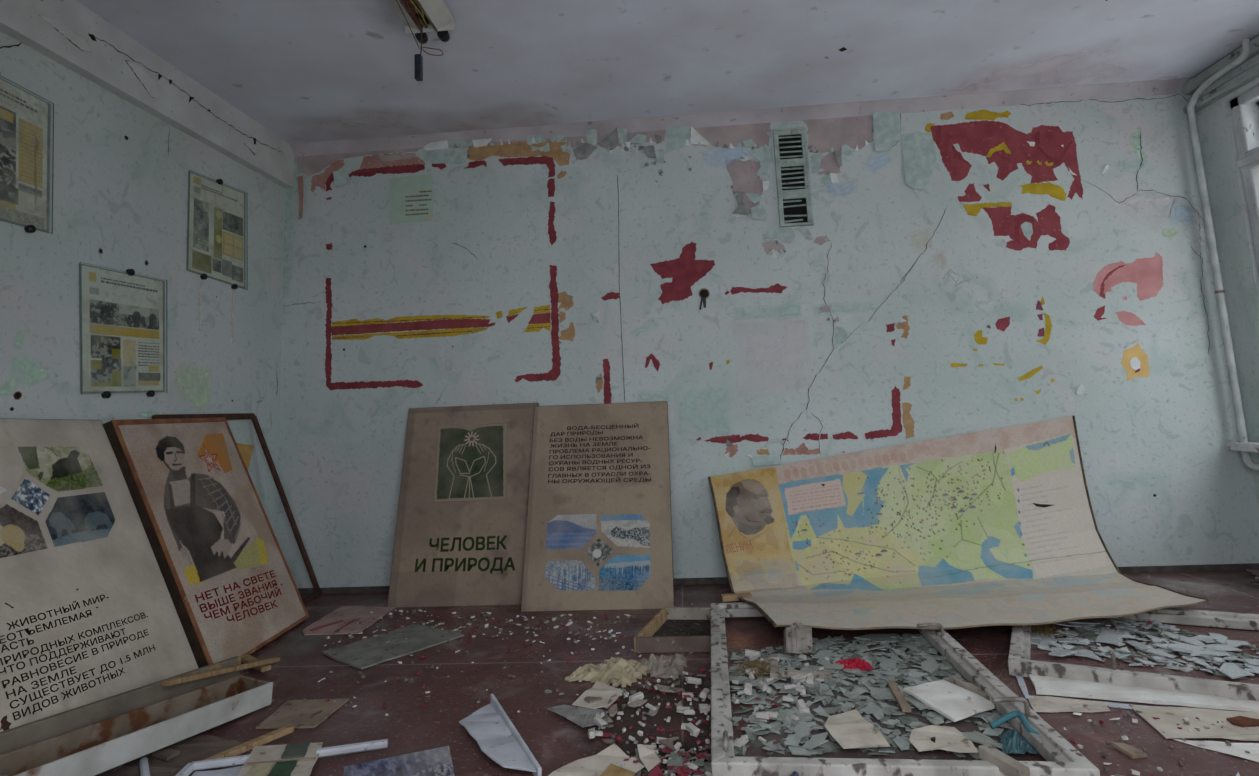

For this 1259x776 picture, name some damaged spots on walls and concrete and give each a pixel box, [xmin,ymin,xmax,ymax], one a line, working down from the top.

crack [65,33,281,152]
peeling [294,123,830,260]
peeling [802,112,937,192]
crack [780,208,974,457]